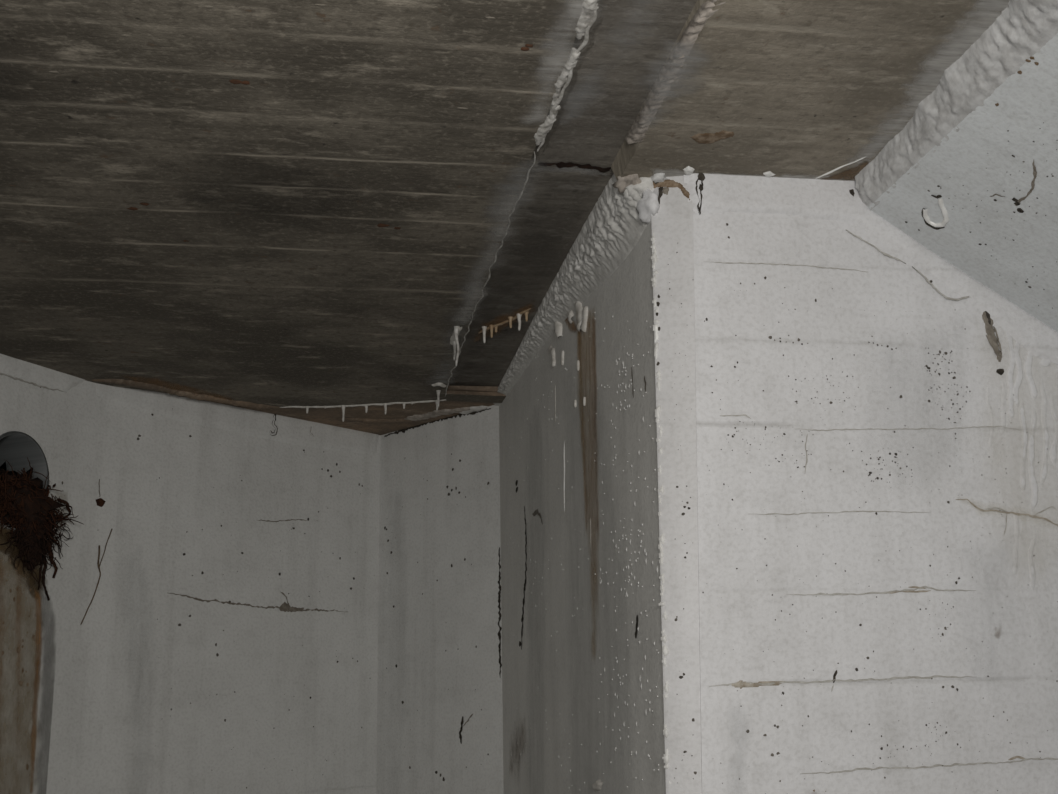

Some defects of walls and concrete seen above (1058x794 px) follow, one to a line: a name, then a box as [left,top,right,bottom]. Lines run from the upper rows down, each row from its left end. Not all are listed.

damp [858,0,1009,163]
crack [538,162,611,172]
crack [956,499,1058,534]
crack [498,480,543,675]
crack [169,592,343,612]
damp [40,617,54,764]
crack [709,670,971,692]